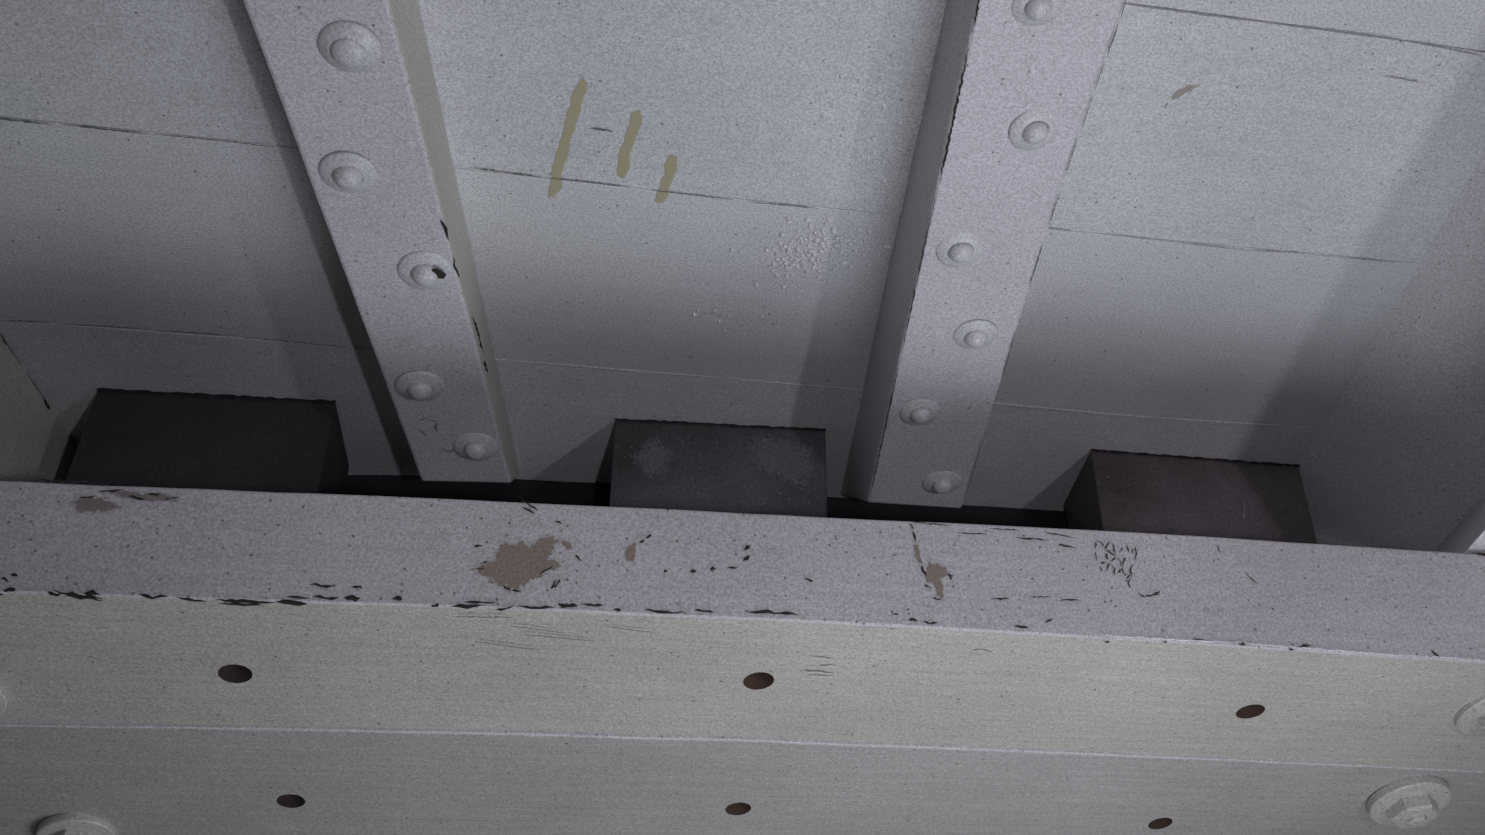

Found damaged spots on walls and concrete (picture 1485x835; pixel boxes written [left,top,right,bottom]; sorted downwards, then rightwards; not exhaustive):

spalling [140,583,362,606]
peeling [431,521,621,612]
peeling [910,524,952,600]